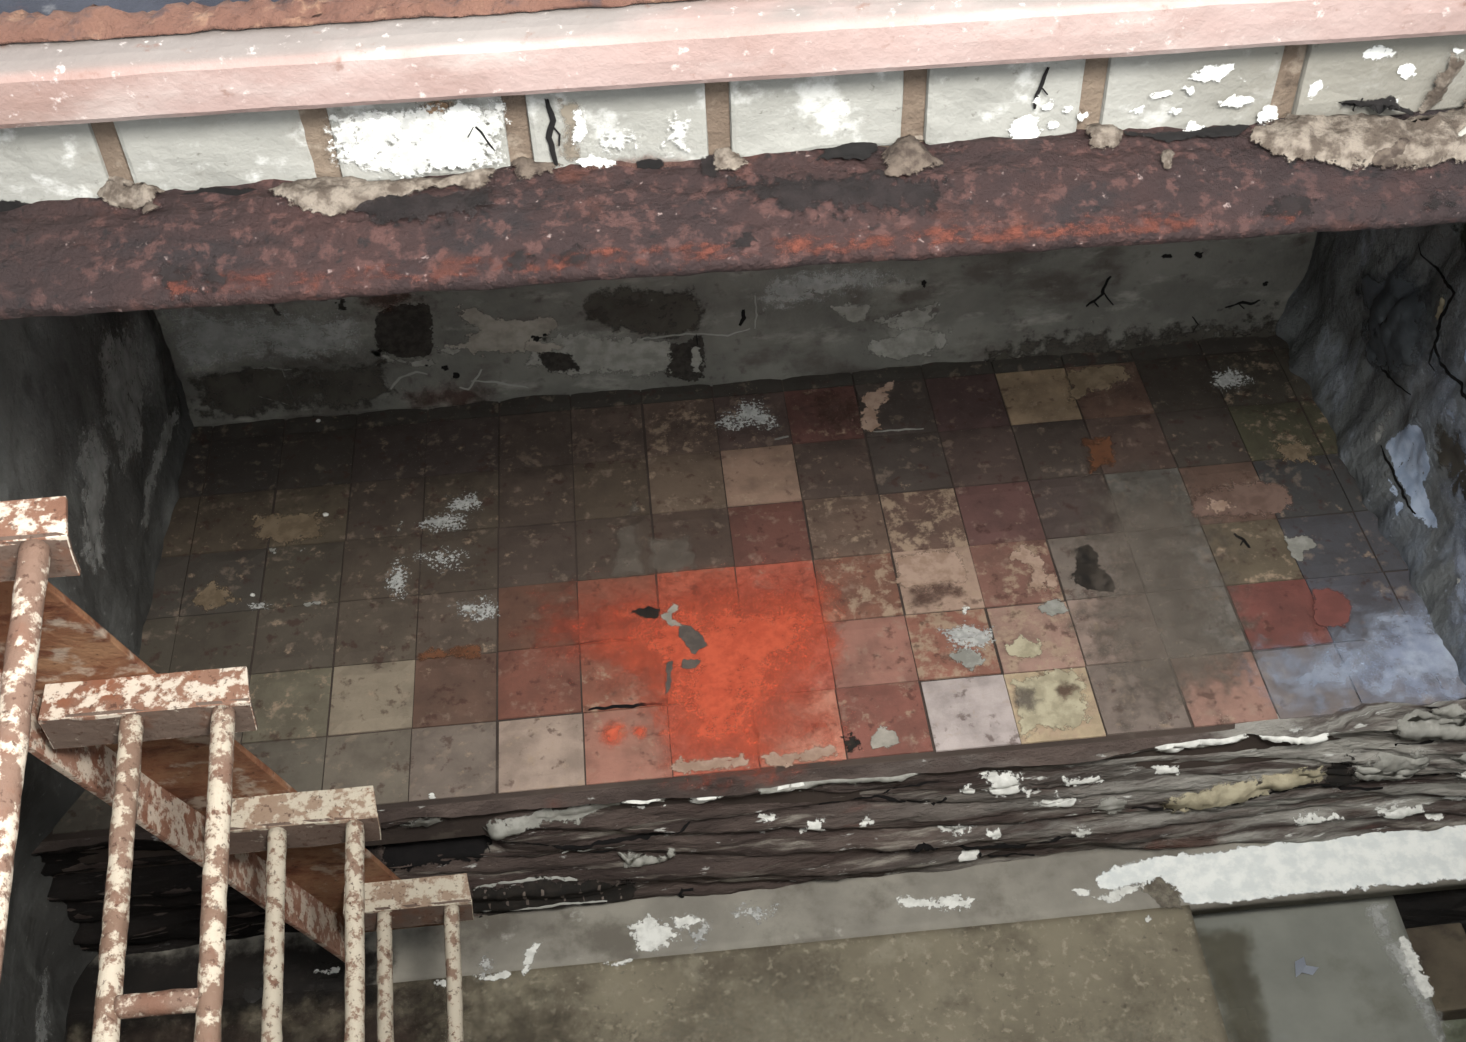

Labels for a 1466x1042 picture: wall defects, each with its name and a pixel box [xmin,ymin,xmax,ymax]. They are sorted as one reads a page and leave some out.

peeling [1363,45,1417,80]
crack [545,99,561,166]
peeling [1006,95,1088,139]
peeling [1123,63,1279,143]
spalling [1338,95,1415,116]
rust [353,186,493,229]
rust [715,169,1194,244]
rust [679,231,757,259]
rust [360,265,411,310]
peeling [374,303,707,382]
crack [1381,244,1466,400]
water stain [1072,616,1466,1042]